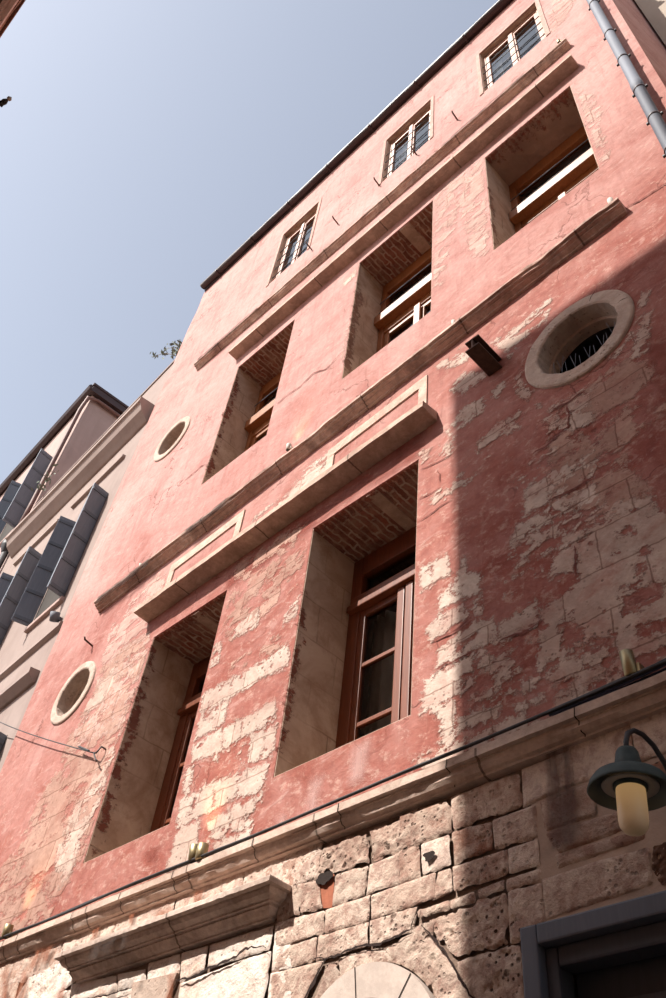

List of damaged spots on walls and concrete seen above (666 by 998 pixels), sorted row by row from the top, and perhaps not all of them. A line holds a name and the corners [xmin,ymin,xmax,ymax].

spalling [0,290,666,935]
crack [304,906,474,998]